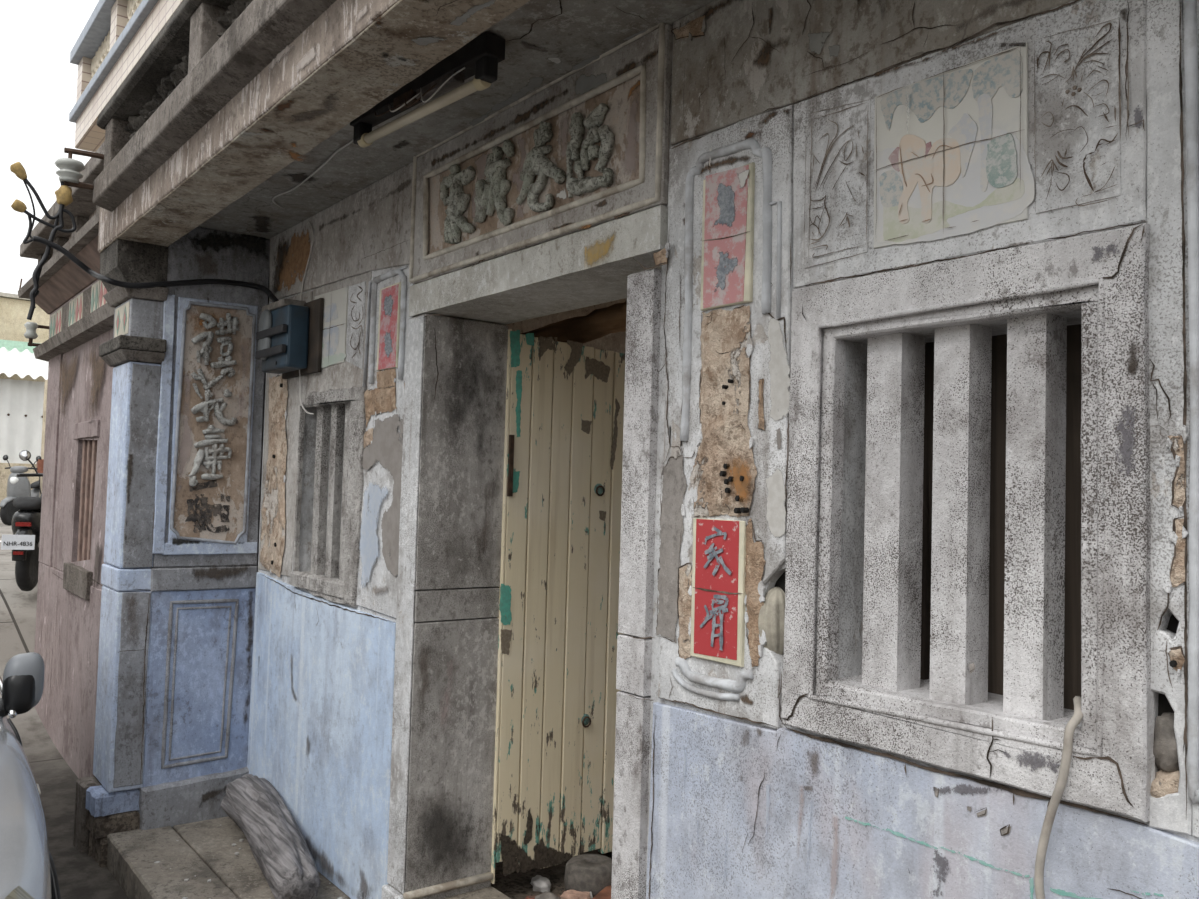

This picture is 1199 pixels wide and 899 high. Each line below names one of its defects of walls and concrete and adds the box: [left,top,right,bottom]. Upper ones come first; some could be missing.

crack [505,0,562,42]
crack [668,0,1079,184]
crack [1125,0,1145,140]
flaking render [364,368,405,449]
peeling [510,330,610,437]
peeling [359,483,388,588]
flaking render [656,305,790,669]
crack [783,412,791,523]
flaking render [1163,425,1189,593]
crack [629,672,1147,899]
peeling [499,809,572,876]
water stain [933,849,951,896]